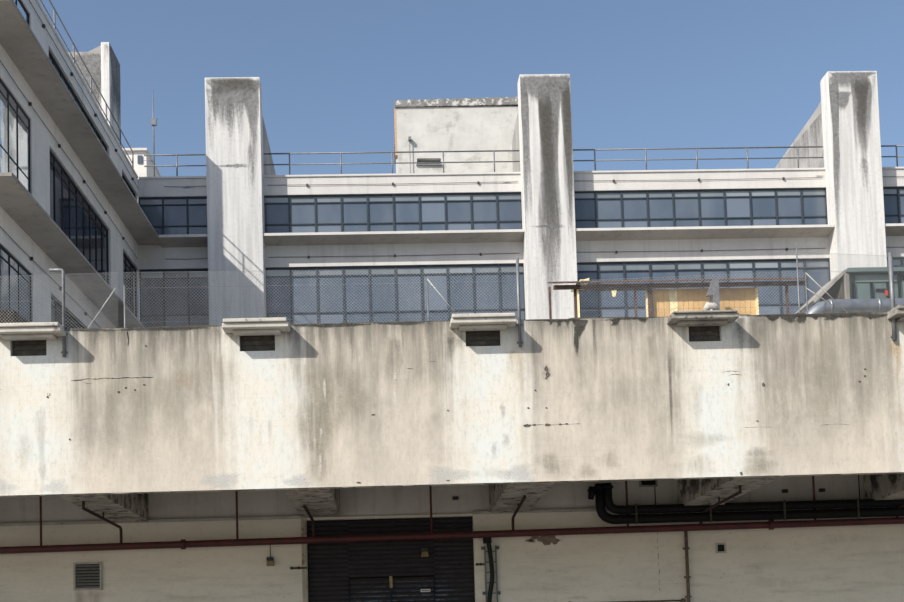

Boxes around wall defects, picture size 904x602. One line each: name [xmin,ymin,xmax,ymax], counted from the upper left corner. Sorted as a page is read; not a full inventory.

damp [207,79,260,172]
damp [520,76,573,249]
damp [829,72,874,200]
damp [526,319,588,352]
damp [610,317,653,325]
damp [746,313,888,323]